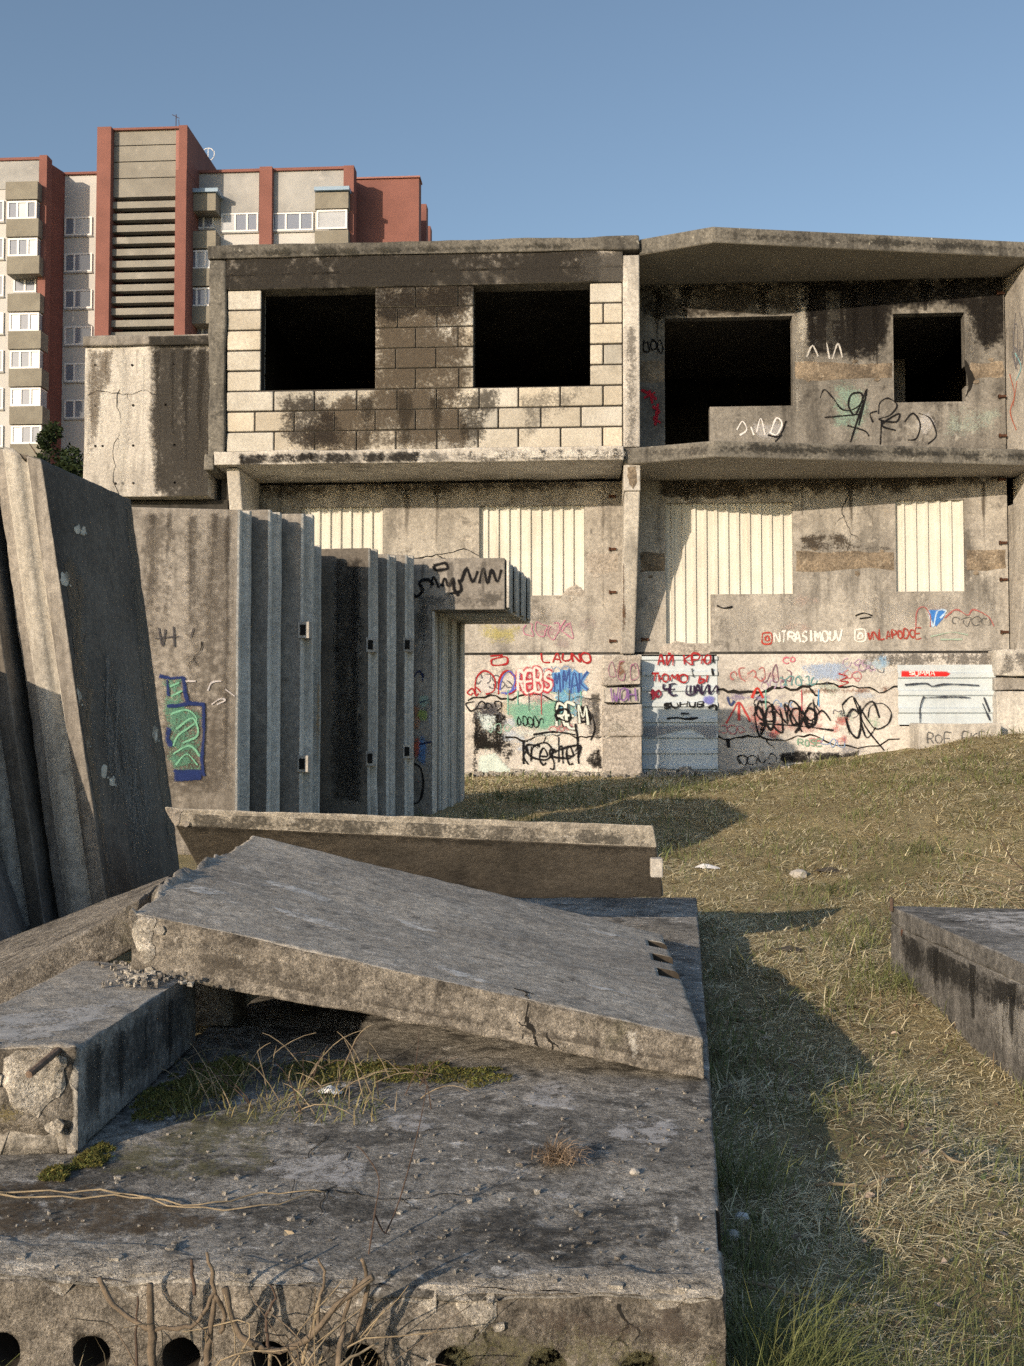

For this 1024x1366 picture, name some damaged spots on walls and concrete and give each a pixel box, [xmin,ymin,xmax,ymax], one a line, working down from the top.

water stain [797,284,878,362]
water stain [88,350,126,476]
water stain [142,350,205,433]
crack [514,988,559,1050]
spalling [0,1046,67,1135]